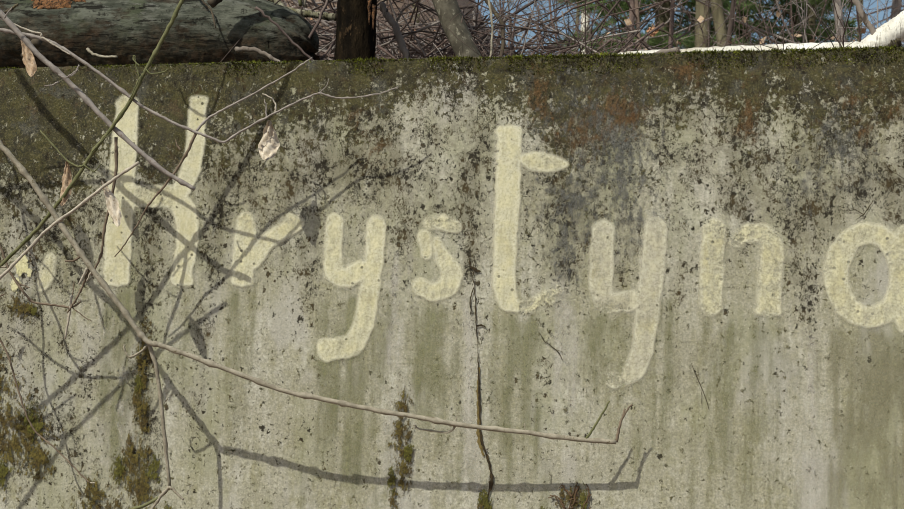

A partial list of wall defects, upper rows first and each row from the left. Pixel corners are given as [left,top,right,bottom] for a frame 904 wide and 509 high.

water stain [545,83,654,282]
water stain [340,298,359,347]
crack [469,256,494,497]